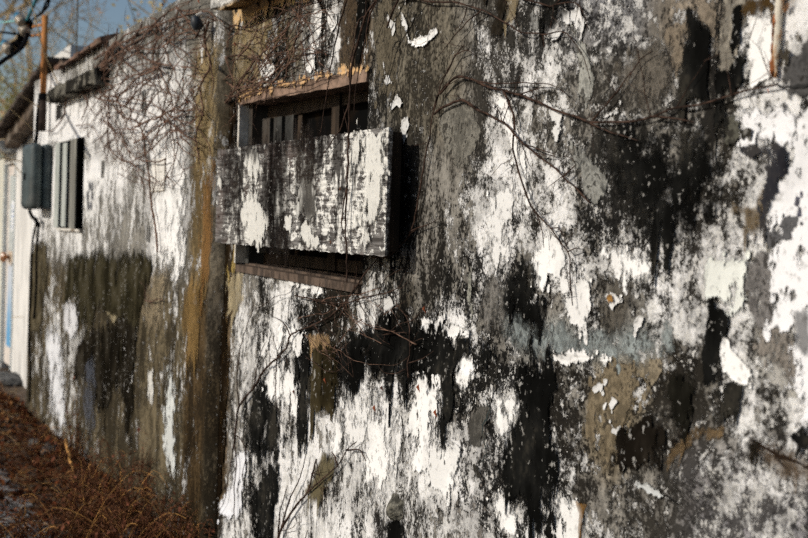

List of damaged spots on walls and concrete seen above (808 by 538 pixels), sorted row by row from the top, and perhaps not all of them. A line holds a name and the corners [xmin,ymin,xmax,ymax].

spalling [232,0,438,110]
peeling [691,0,775,88]
corrosion [769,2,790,78]
damp [599,0,775,290]
peeling [704,40,808,431]
damp [64,246,155,441]
peeling [217,448,249,524]
peeling [258,320,306,420]
damp [293,308,500,458]
peeling [328,371,520,520]
damp [501,258,566,538]
damp [610,296,743,474]